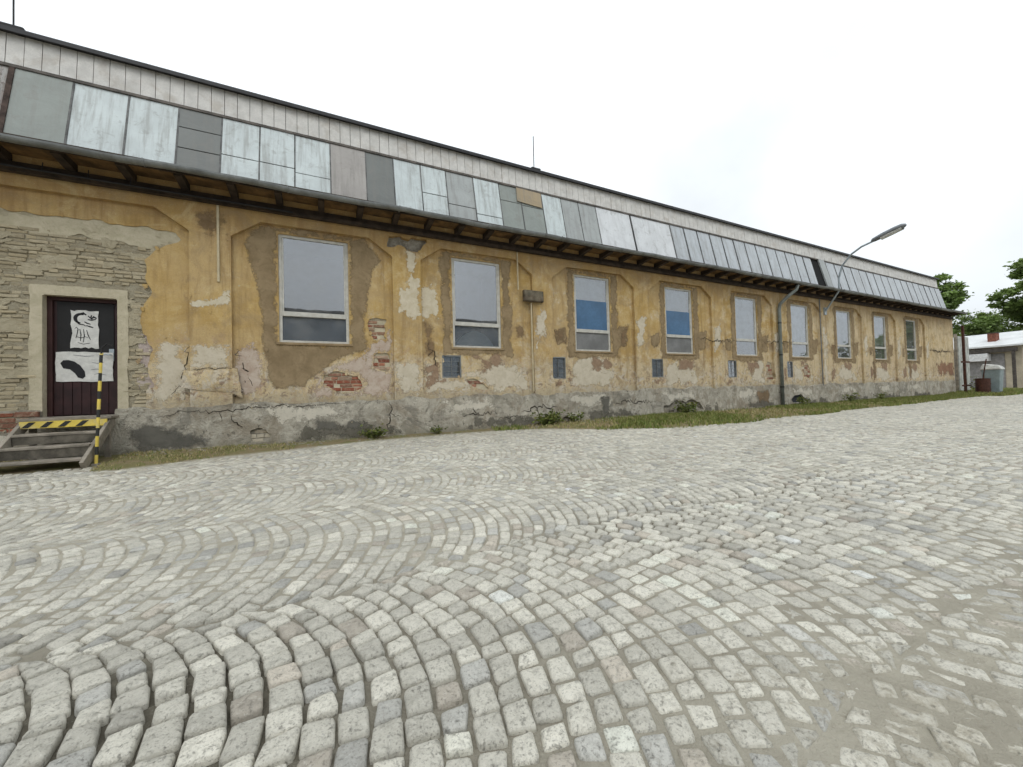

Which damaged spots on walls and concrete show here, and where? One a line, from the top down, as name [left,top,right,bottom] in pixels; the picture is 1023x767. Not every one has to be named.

crack [156,346,346,427]
flaking render [0,208,531,445]